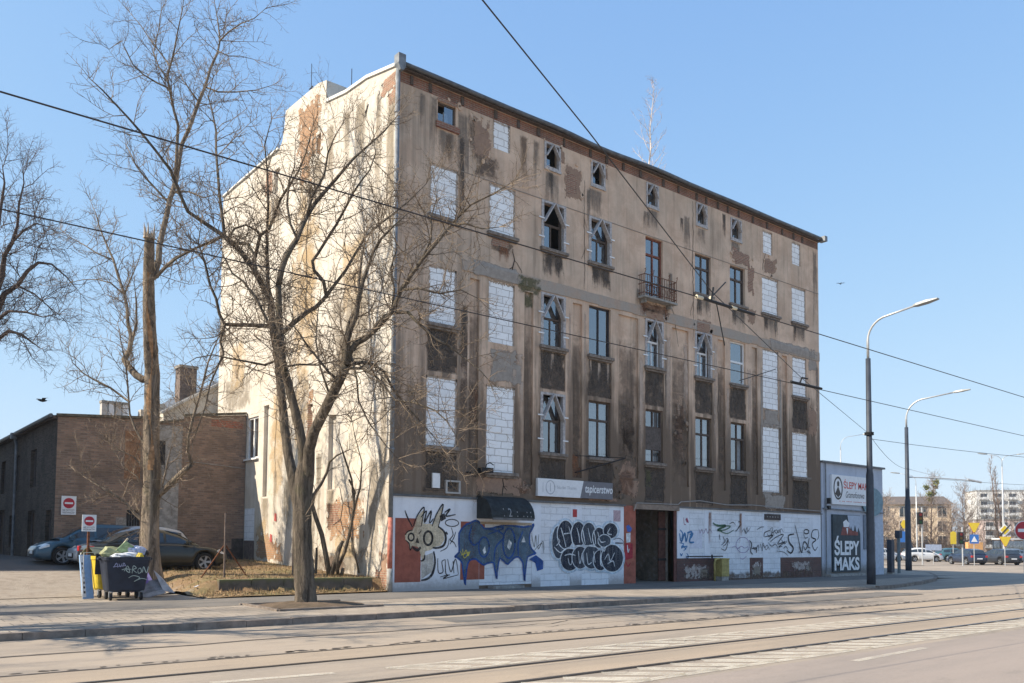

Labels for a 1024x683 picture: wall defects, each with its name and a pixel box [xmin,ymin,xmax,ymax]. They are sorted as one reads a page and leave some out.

spalling [296,94,324,185]
peeling [470,116,499,177]
peeling [560,145,608,201]
leakage [546,254,563,272]
leakage [593,267,610,286]
peeling [730,247,778,296]
leakage [639,339,671,427]
spalling [325,494,364,542]